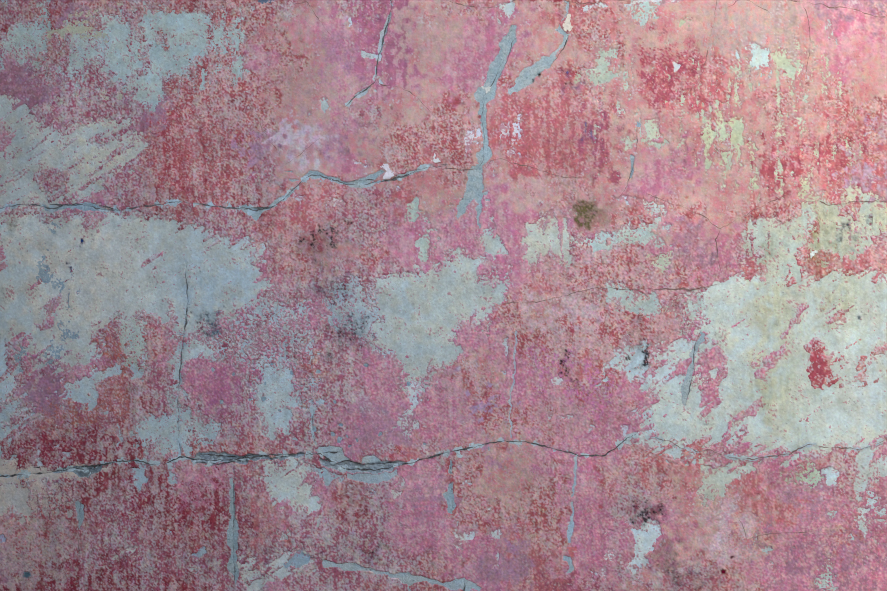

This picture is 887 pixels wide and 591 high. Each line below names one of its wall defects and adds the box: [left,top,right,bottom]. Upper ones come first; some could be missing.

peeling [0,0,522,530]
crack [0,31,583,216]
leakage [573,200,597,230]
peeling [508,0,887,562]
crack [0,259,887,584]
spalling [443,460,476,552]
peeling [591,518,662,582]
peeling [814,558,838,591]